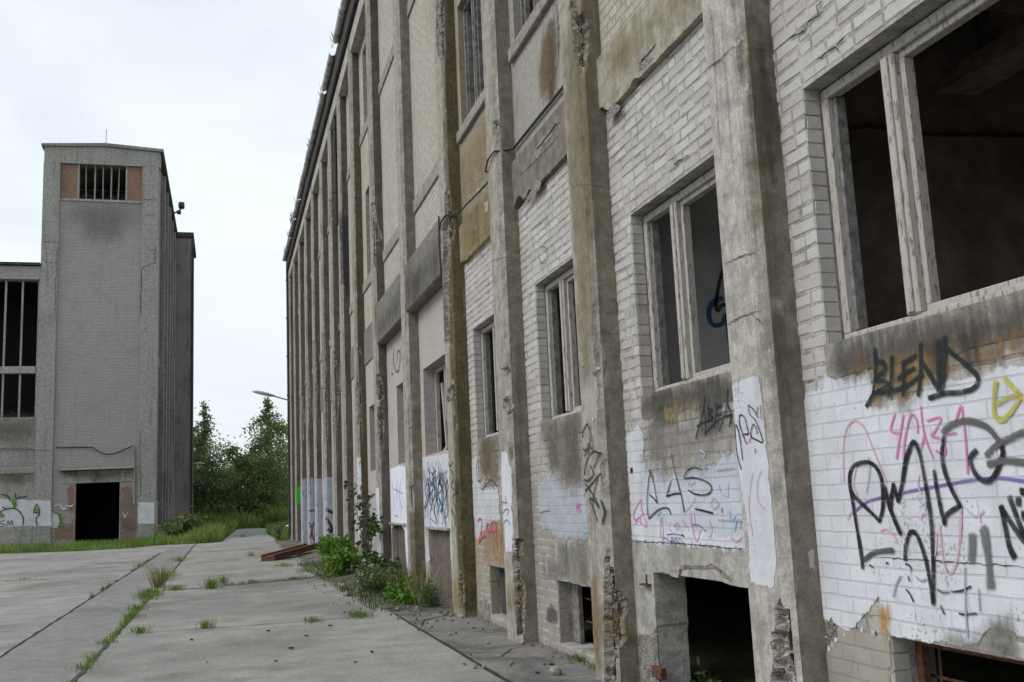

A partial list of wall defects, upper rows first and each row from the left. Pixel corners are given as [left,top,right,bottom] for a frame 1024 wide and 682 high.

water stain [539,19,557,100]
spalling [568,0,589,66]
crack [707,1,823,141]
crack [817,37,845,60]
crack [140,242,156,319]
water stain [545,420,579,481]
spalling [512,539,527,636]
spalling [603,557,660,682]
spalling [770,598,797,682]